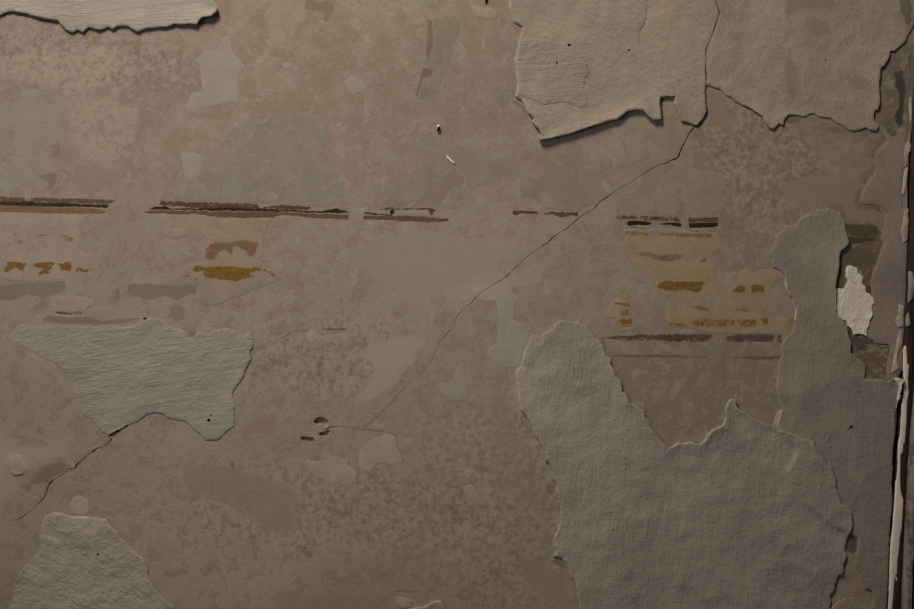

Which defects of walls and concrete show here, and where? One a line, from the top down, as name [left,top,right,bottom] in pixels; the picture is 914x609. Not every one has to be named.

flaking render [0,0,218,33]
crack [325,0,720,463]
flaking render [115,283,196,322]
flaking render [509,0,914,609]
crack [12,424,130,521]
flaking render [8,512,174,609]